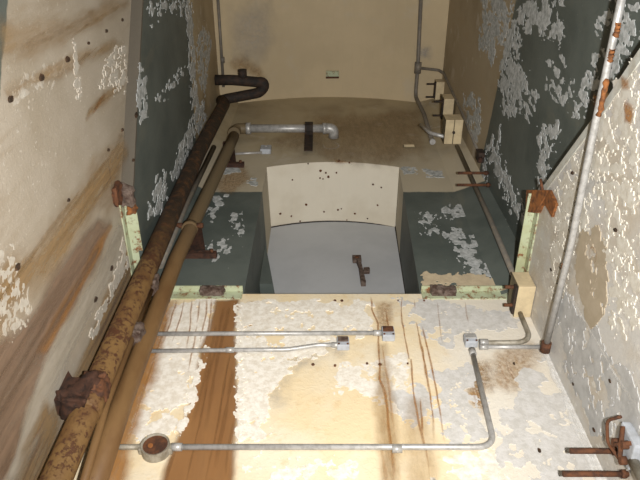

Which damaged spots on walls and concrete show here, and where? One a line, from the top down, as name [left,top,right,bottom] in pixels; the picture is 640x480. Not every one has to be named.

peeling [0,243,33,343]
damp [8,226,125,479]
peeling [135,0,212,220]
peeling [132,299,216,442]
rust [163,300,238,480]
peeling [233,299,375,444]
peeling [418,204,496,286]
peeling [332,352,591,480]
peeling [481,124,525,234]
peeling [478,0,606,124]
peeling [533,119,561,190]
peeling [546,0,640,441]